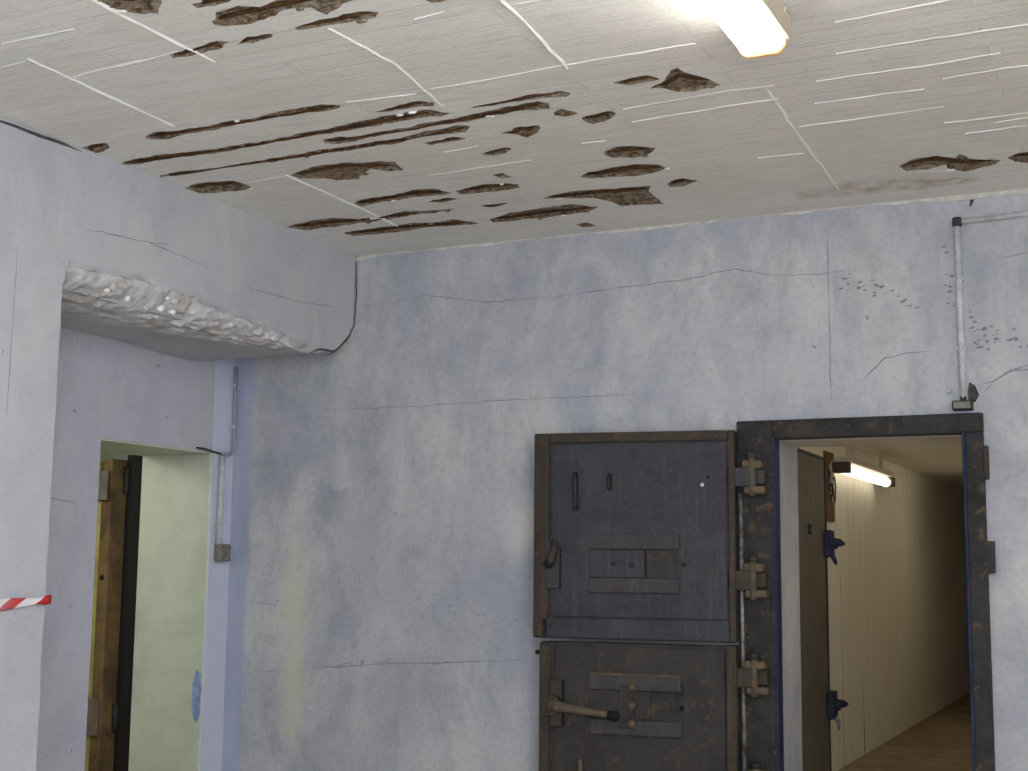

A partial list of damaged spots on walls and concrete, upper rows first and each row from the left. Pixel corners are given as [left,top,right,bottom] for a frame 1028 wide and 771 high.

spalling [97,0,162,15]
spalling [170,0,378,58]
spalling [122,91,616,193]
peeling [289,146,1028,261]
spalling [61,266,307,349]
crack [248,232,931,401]
crack [974,364,1028,394]